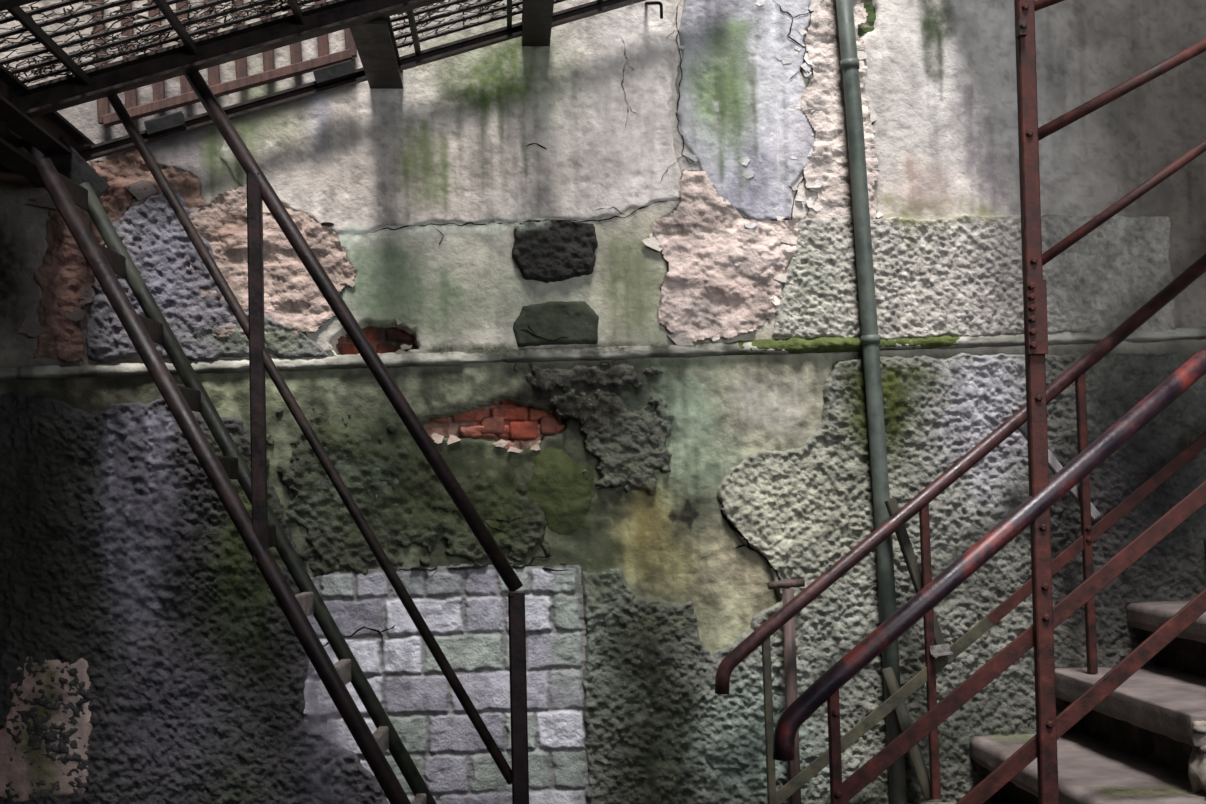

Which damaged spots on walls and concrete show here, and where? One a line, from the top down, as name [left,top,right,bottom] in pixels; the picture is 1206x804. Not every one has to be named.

flaking render [86,0,853,348]
flaking render [853,0,883,220]
flaking render [17,193,96,362]
flaking render [324,317,417,357]
flaking render [423,401,566,453]